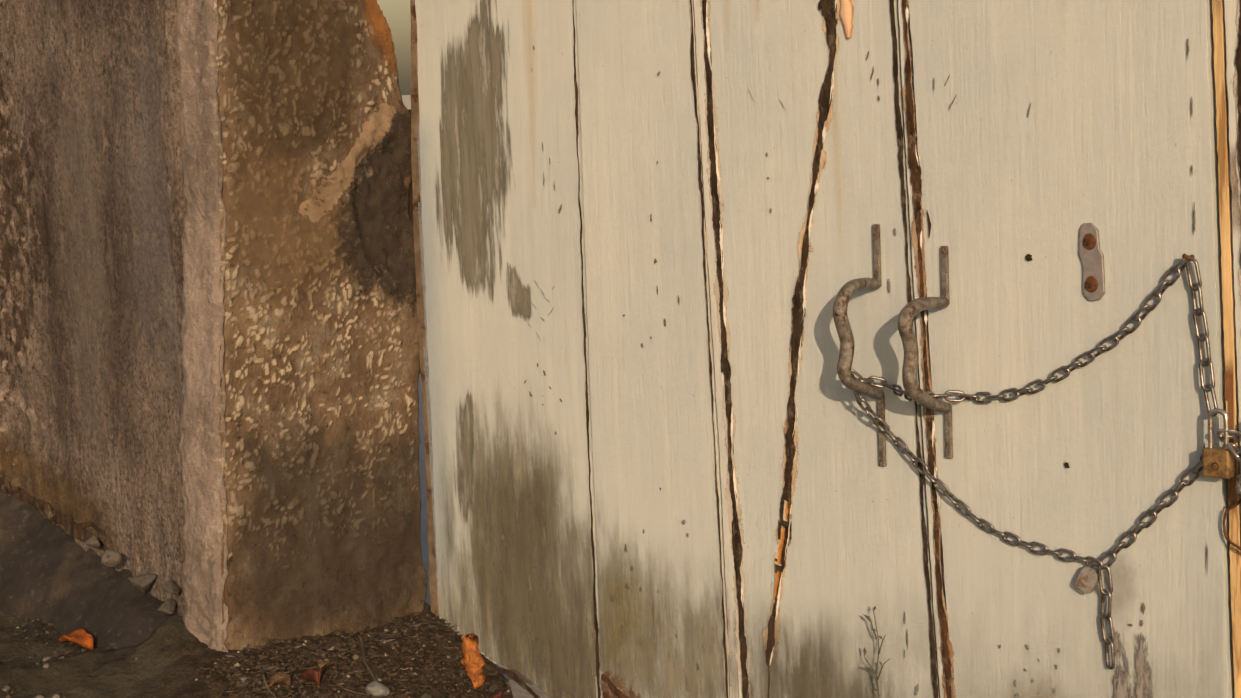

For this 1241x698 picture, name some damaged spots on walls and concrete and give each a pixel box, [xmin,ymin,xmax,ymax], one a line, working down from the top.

damp [475,469,584,698]
crack [689,0,840,698]
crack [890,0,956,698]
crack [1233,0,1241,301]